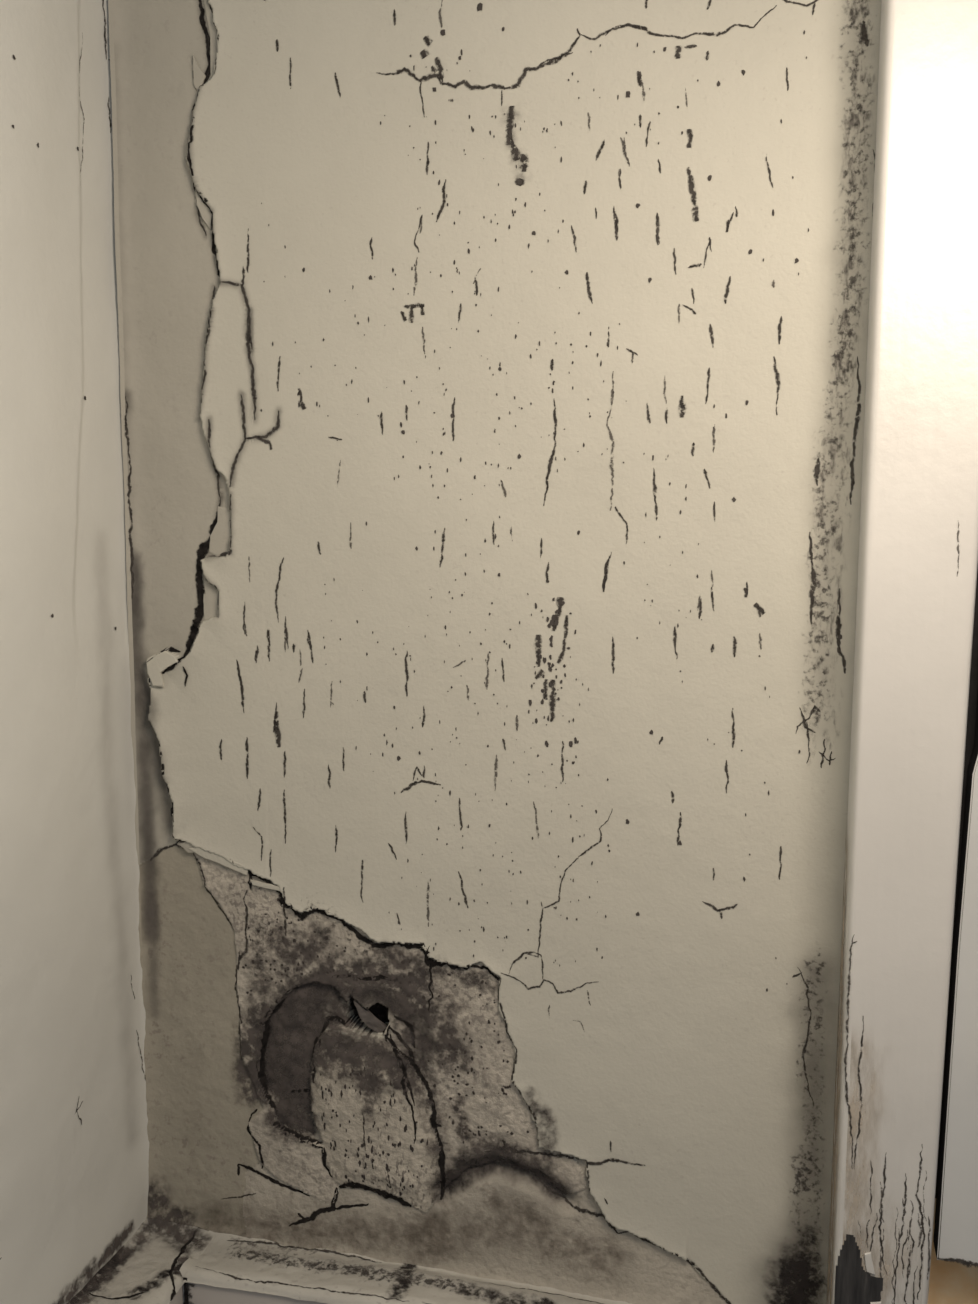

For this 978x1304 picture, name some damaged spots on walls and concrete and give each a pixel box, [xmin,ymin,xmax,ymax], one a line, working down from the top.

crack [379,0,818,293]
crack [772,281,783,415]
water stain [799,1,875,768]
peeling [108,0,728,1304]
crack [149,0,738,1304]
crack [673,570,762,659]
water stain [234,918,568,1304]
water stain [786,955,824,1195]
crack [827,908,931,1304]
peeling [80,1236,176,1300]
crack [89,1231,428,1304]
peeling [834,1234,883,1304]